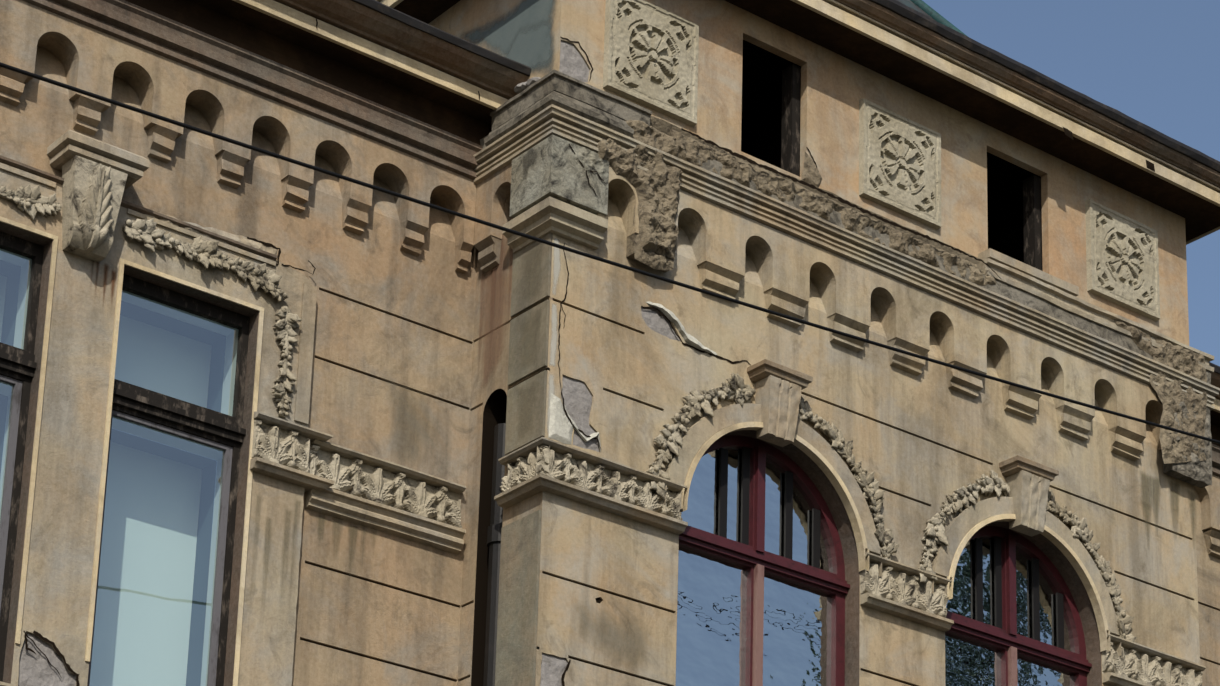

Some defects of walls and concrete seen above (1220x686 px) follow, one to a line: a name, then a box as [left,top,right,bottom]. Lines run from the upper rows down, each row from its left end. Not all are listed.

damp [465,0,555,72]
spalling [559,37,593,83]
crack [558,243,569,398]
spalling [548,239,601,453]
flaking render [641,301,751,365]
spalling [18,631,80,686]
spalling [540,653,571,686]